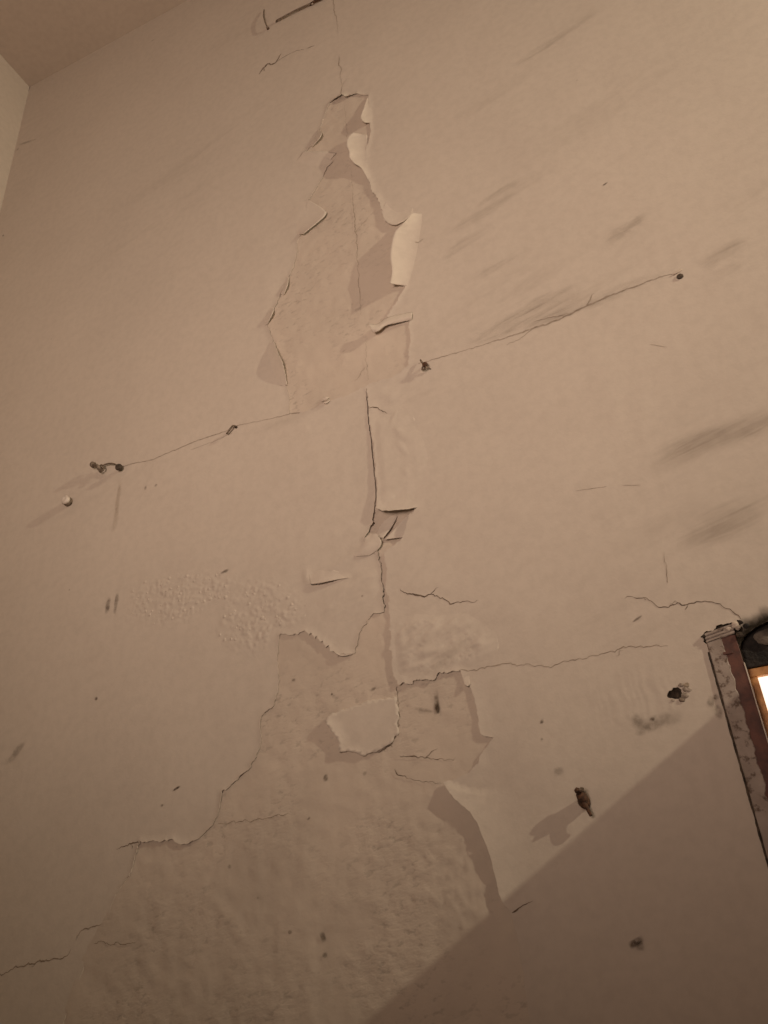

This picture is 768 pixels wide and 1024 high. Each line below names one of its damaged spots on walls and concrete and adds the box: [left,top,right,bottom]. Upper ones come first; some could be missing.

peeling [264,93,422,414]
crack [418,274,672,364]
crack [122,412,300,467]
peeling [354,515,409,557]
crack [400,587,477,605]
crack [462,645,668,671]
peeling [63,608,530,1024]